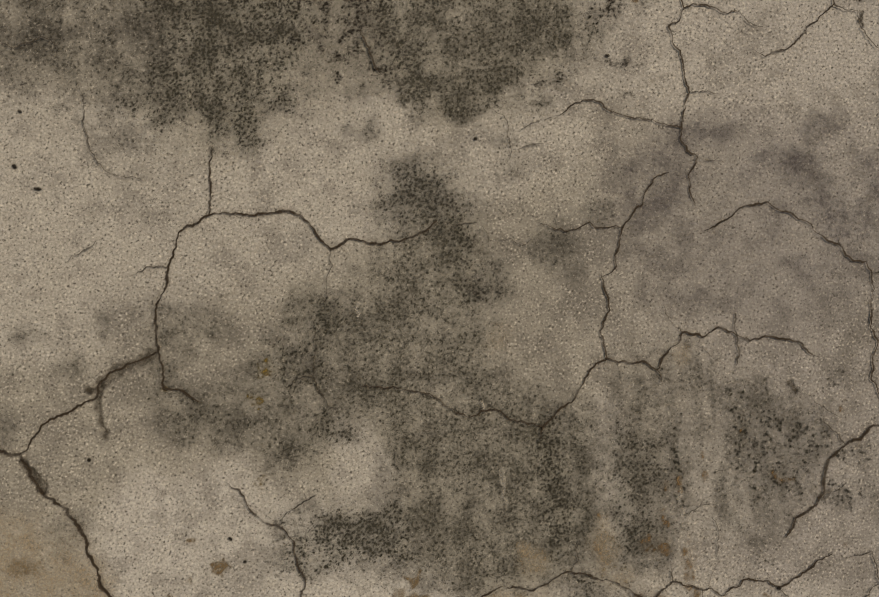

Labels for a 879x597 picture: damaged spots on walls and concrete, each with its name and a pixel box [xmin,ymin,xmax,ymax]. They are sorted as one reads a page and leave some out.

crack [77,83,139,179]
leakage [0,0,622,154]
crack [755,0,878,57]
crack [360,0,818,435]
crack [0,148,525,597]
leakage [148,158,696,597]
leakage [679,340,832,524]
crack [704,201,879,394]
crack [785,403,879,538]
peeling [393,570,428,597]
crack [481,540,879,597]